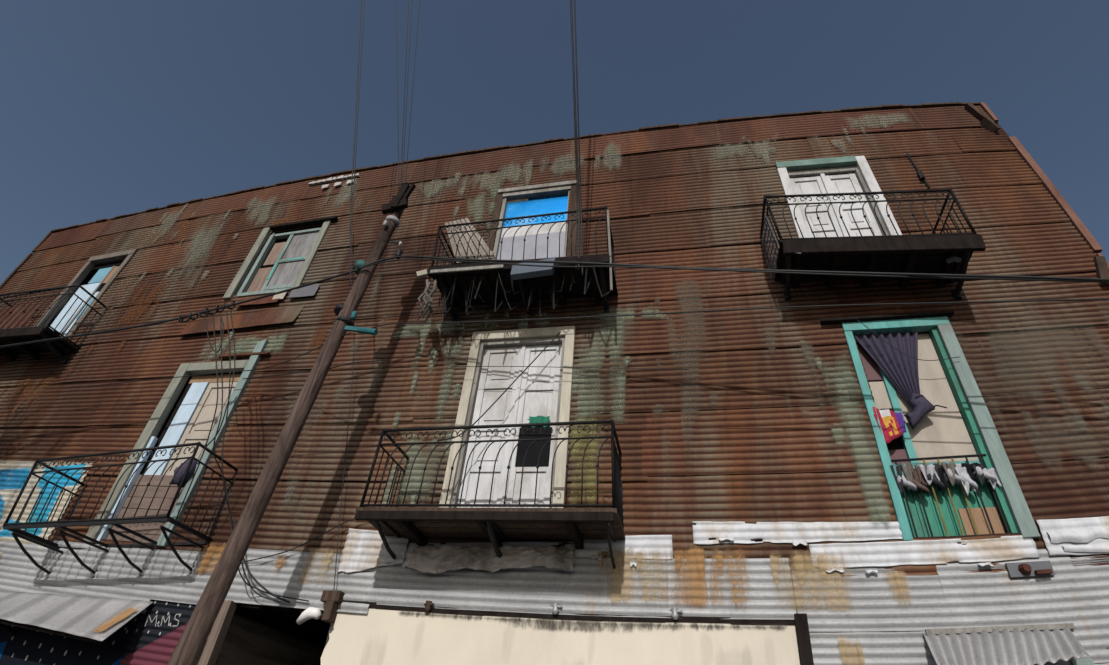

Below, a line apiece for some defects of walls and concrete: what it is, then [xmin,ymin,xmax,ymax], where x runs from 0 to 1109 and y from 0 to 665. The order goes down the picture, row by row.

corrosion [218,352,272,360]
corrosion [599,550,661,602]
corrosion [675,549,746,607]
corrosion [771,554,847,609]
leakage [495,618,739,631]
corrosion [839,637,865,665]